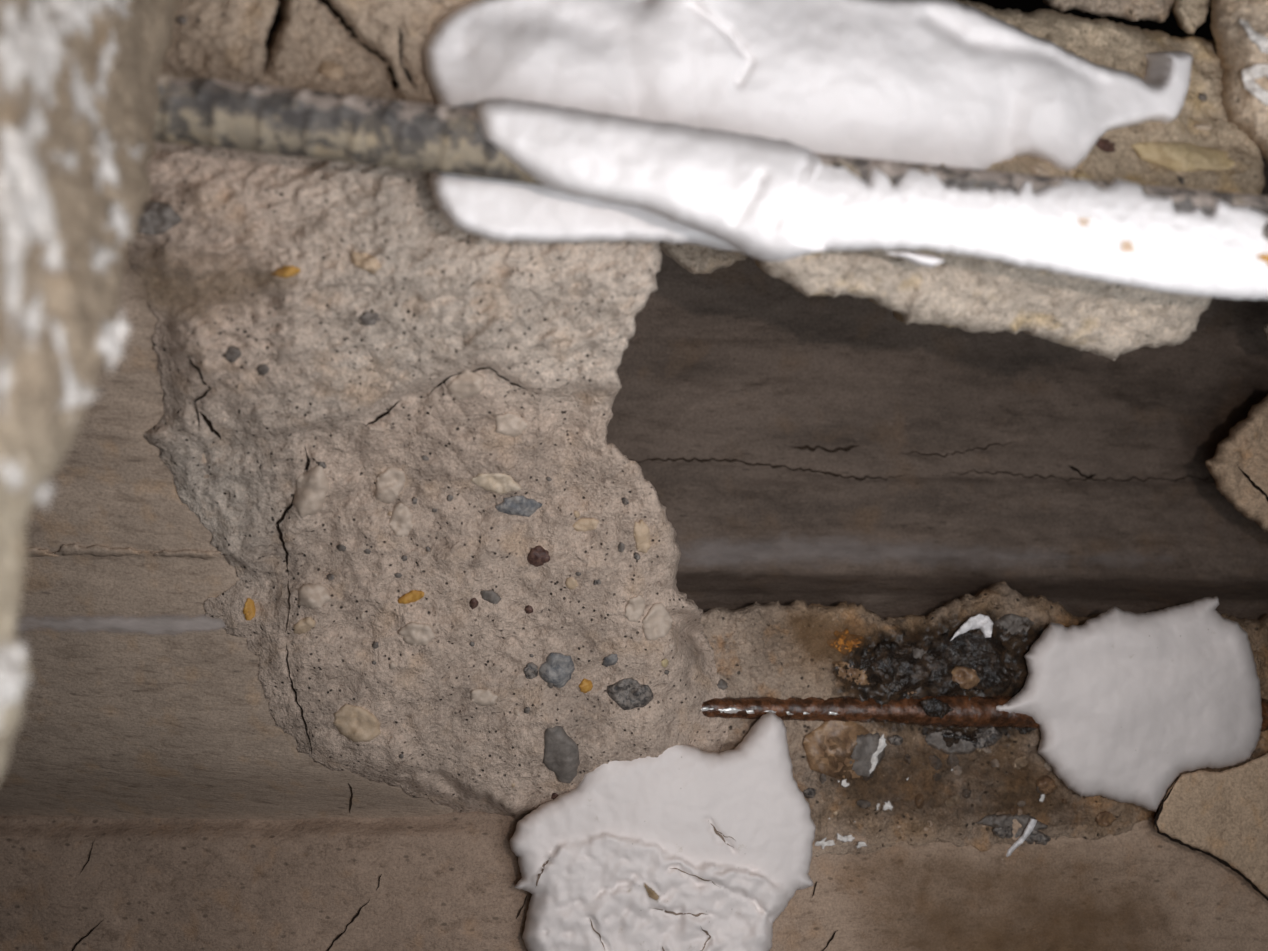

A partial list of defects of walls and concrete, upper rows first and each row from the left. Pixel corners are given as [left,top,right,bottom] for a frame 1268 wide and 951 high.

crack [265,0,281,49]
crack [318,0,417,96]
spalling [955,0,1265,195]
spalling [754,249,1213,361]
spalling [0,0,1101,820]
crack [631,441,1268,501]
spalling [1205,394,1268,532]
crack [276,441,312,754]
rust [812,612,1071,817]
spalling [1221,613,1268,700]
spalling [783,720,1268,859]
crack [1154,776,1268,901]